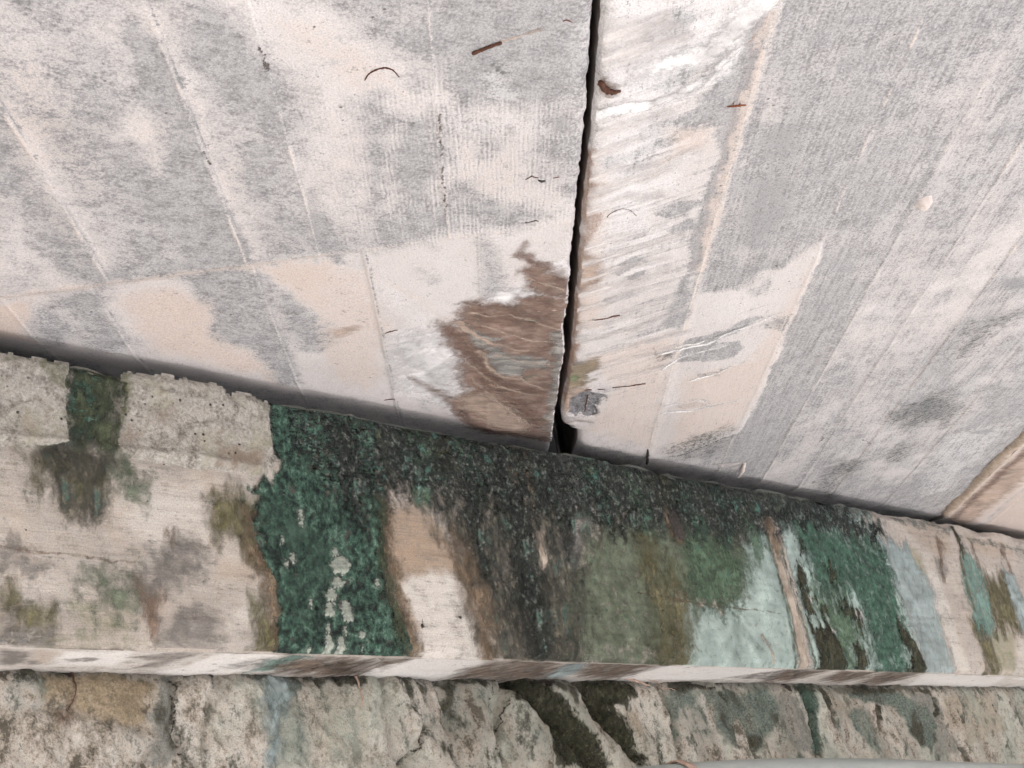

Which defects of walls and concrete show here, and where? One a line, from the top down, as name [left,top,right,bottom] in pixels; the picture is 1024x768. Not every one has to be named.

corrosion [472,29,543,56]
corrosion [597,80,621,98]
water stain [595,0,783,136]
water stain [388,244,622,442]
water stain [657,317,771,371]
spalling [567,391,607,419]
water stain [39,438,151,524]
water stain [432,450,600,681]
water stain [579,530,695,681]
water stain [263,657,408,677]
water stain [761,635,919,684]